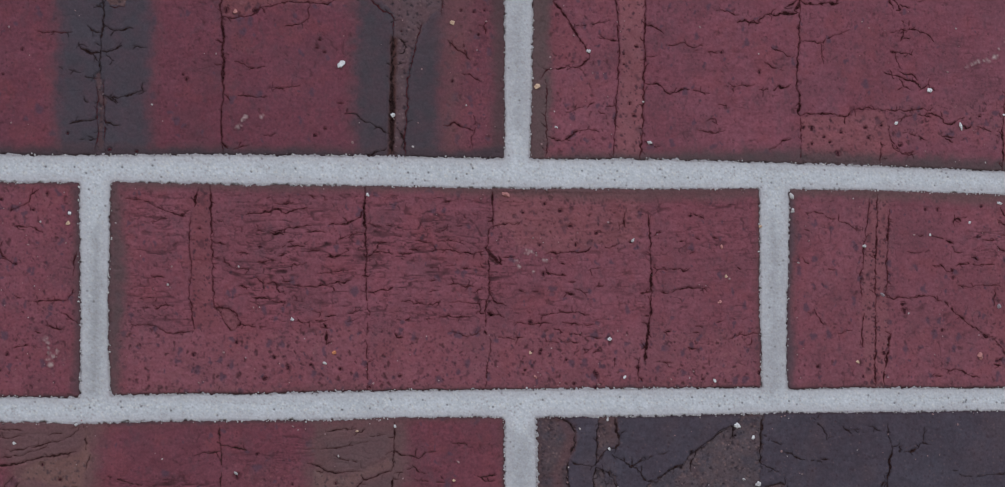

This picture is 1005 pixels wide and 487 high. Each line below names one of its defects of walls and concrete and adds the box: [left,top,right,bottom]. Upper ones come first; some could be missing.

crack [40,0,145,141]
crack [215,0,300,149]
crack [340,36,407,156]
crack [645,0,848,134]
crack [872,0,998,160]
crack [128,275,190,335]
crack [210,190,758,391]
crack [883,209,1005,378]
crack [0,427,88,458]
crack [196,428,247,487]
crack [318,422,467,487]
crack [761,416,928,487]